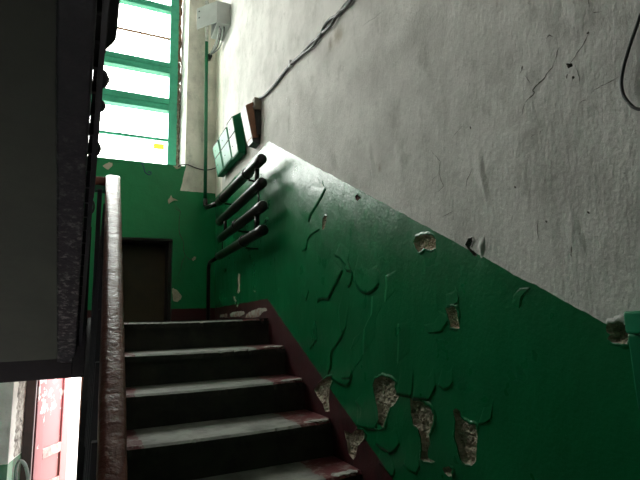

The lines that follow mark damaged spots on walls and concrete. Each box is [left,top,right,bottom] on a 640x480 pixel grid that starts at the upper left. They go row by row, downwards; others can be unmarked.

peeling [299,175,327,252]
flaking render [413,231,436,255]
peeling [172,288,183,303]
peeling [220,273,267,318]
flaking render [606,315,629,350]
flaking render [304,374,334,423]
flaking render [372,372,399,431]
flaking render [344,428,367,460]
flaking render [410,398,437,465]